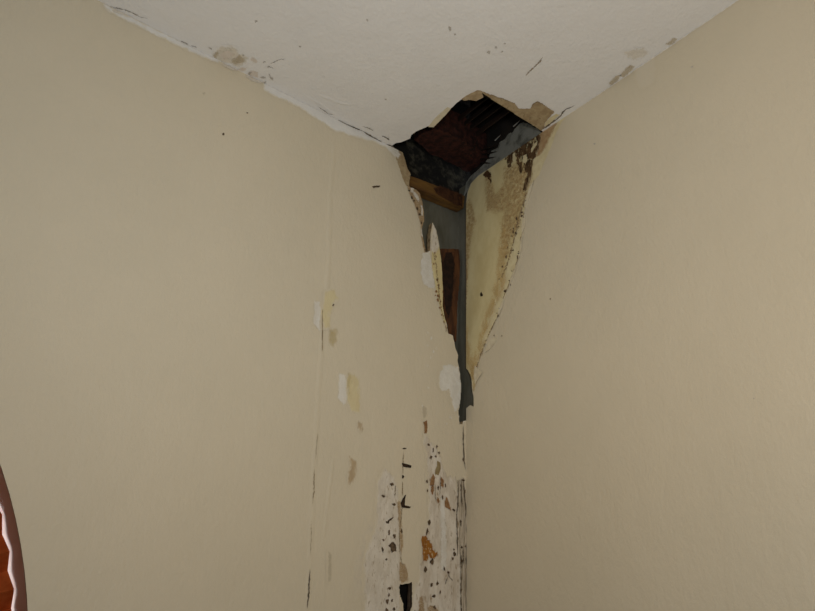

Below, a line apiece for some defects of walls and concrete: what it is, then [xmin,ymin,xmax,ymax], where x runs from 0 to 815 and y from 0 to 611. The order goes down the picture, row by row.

peeling [211,45,284,84]
damp [483,123,556,260]
peeling [427,362,461,424]
peeling [349,420,465,611]